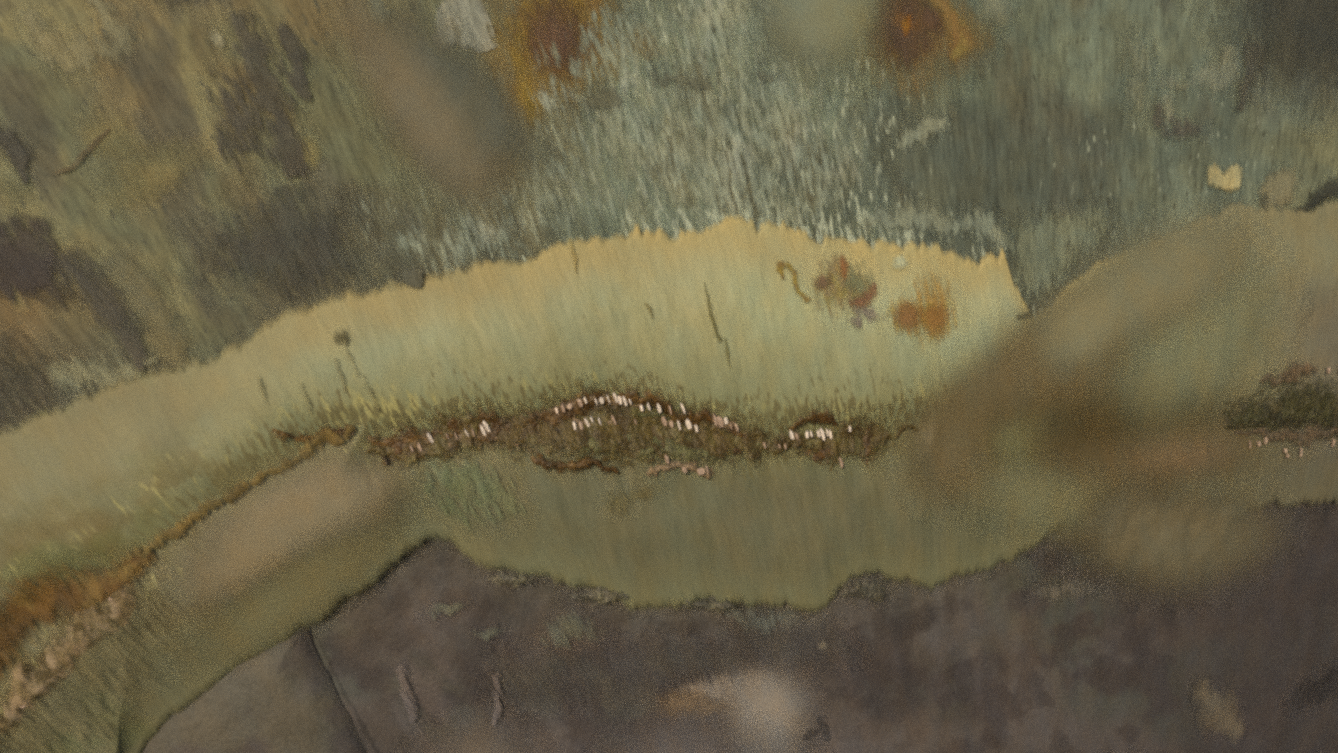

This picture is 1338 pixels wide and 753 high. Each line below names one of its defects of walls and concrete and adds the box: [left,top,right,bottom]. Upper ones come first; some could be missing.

rust [498,0,611,112]
rust [876,0,974,78]
spalling [333,331,348,344]
rust [777,256,876,327]
rust [891,280,956,336]